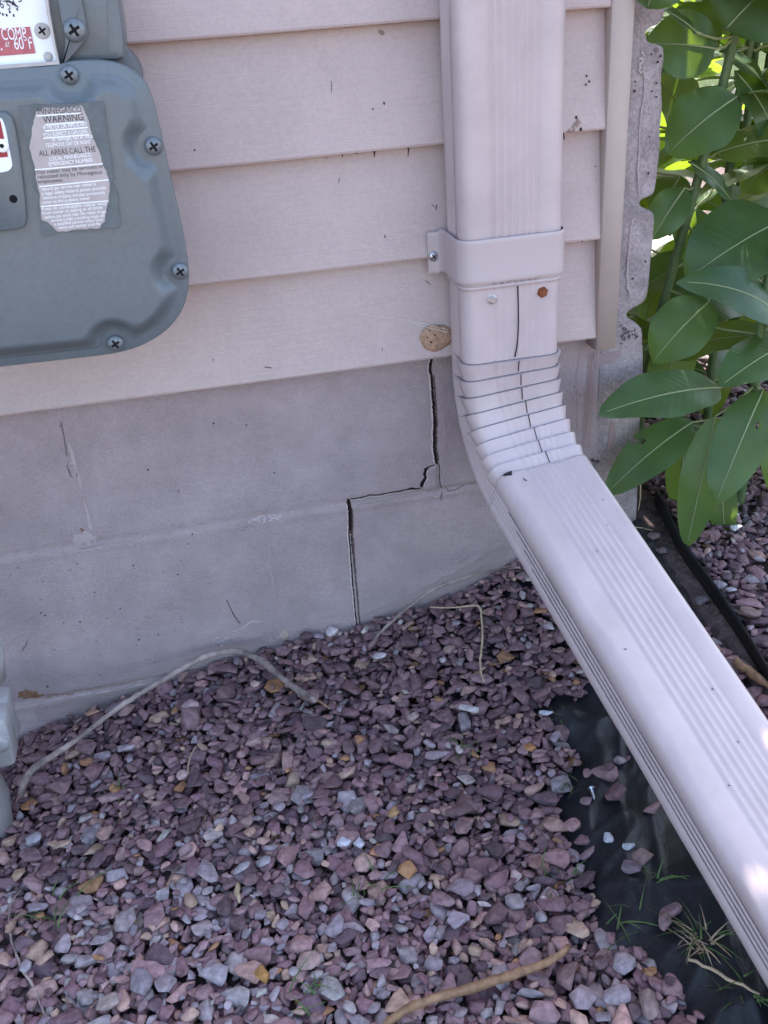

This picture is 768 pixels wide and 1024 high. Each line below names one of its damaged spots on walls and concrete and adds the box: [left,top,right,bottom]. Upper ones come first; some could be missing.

crack [346,359,473,625]